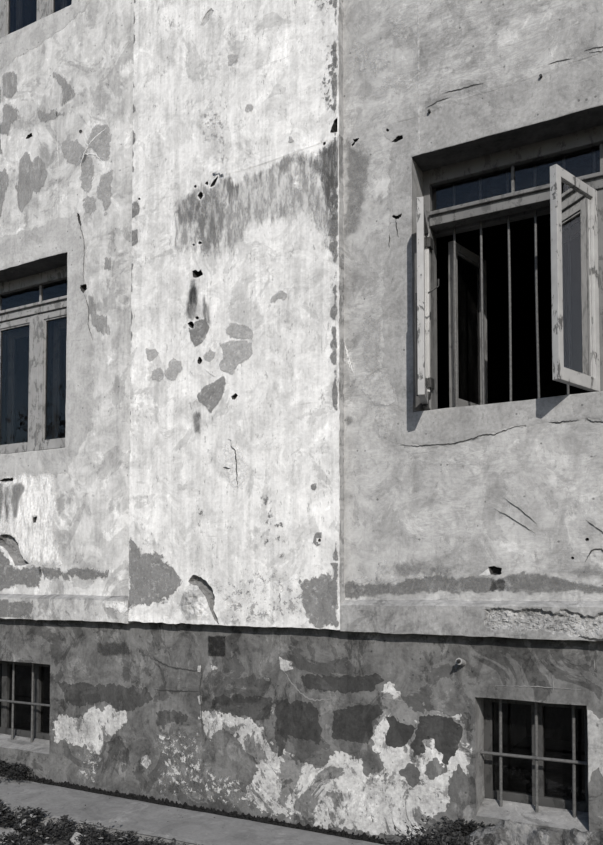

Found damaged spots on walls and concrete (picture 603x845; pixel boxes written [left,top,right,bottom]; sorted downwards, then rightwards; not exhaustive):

crack [406,425,524,447]
spalling [0,534,29,567]
spalling [479,566,502,576]
spalling [188,575,219,624]
spalling [484,607,603,638]
peeling [279,657,293,671]
peeling [52,681,153,755]
peeling [156,710,188,740]
flaking render [198,673,472,840]